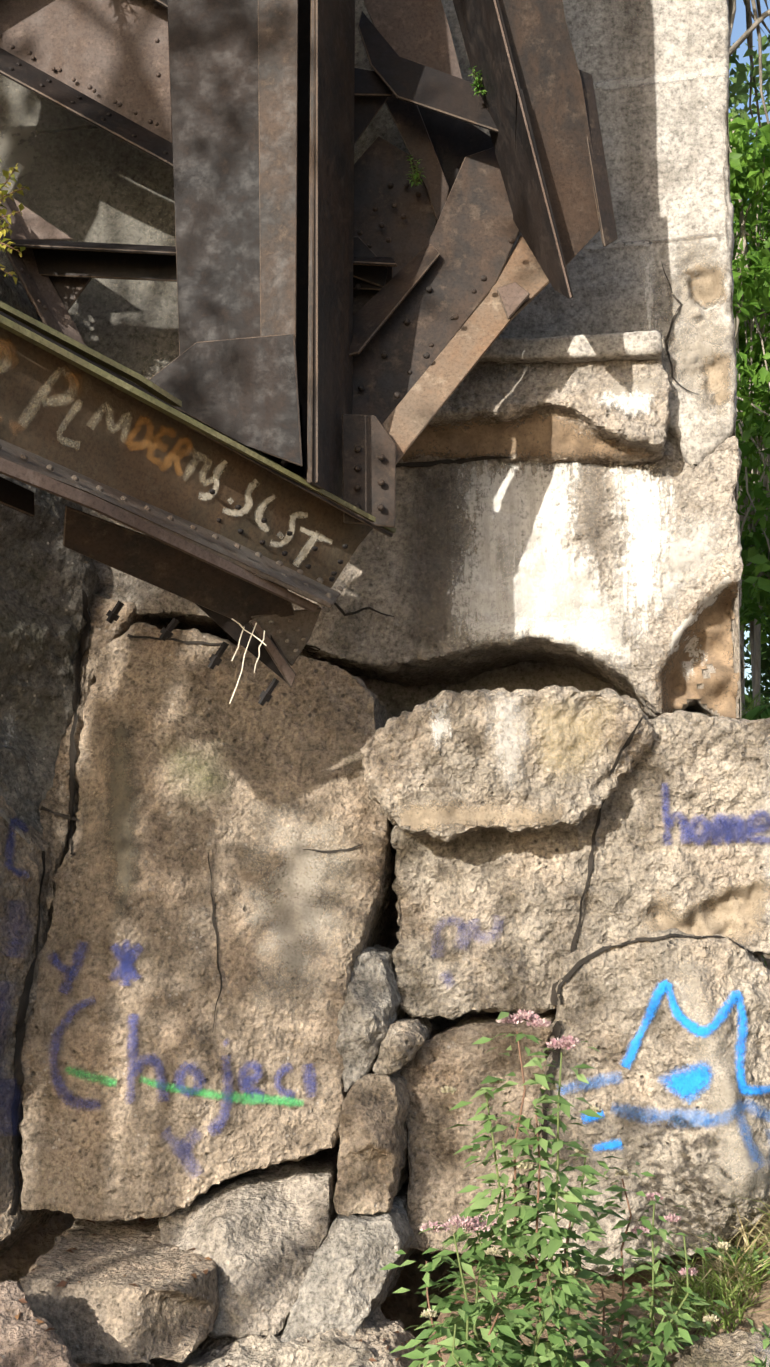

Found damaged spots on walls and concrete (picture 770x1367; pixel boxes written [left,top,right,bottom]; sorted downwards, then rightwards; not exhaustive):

spalling [602,237,735,424]
spalling [396,408,654,468]
crack [127,634,232,645]
damp [413,460,711,669]
spalling [656,576,743,719]
crack [9,589,91,1215]
crack [208,853,222,1032]
crack [540,717,770,1150]